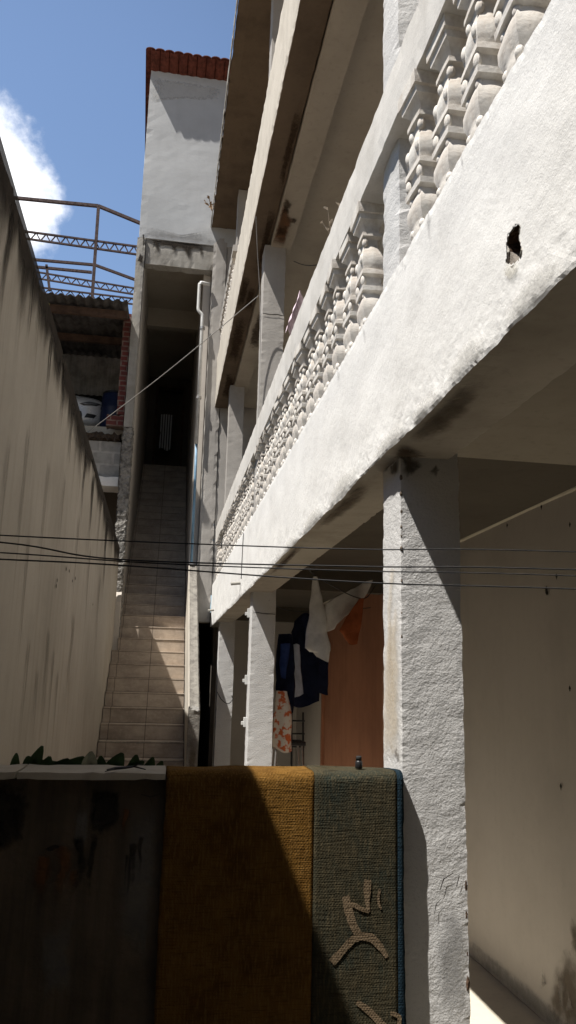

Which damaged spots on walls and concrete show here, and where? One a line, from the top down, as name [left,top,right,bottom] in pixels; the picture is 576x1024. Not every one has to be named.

spalling [505,224,522,276]
leakage [326,491,362,522]